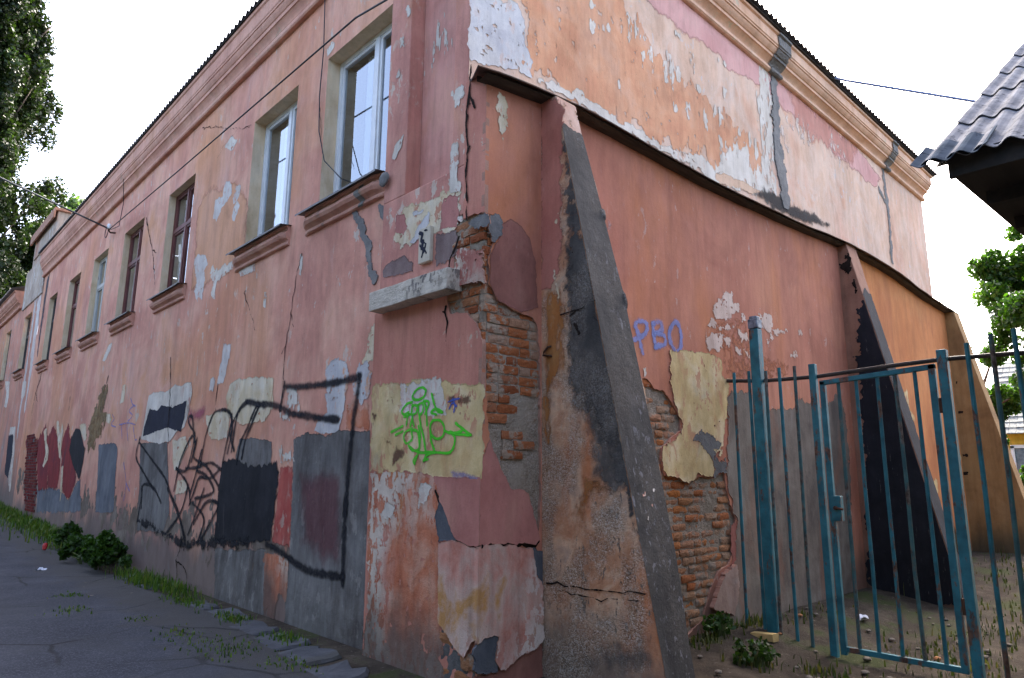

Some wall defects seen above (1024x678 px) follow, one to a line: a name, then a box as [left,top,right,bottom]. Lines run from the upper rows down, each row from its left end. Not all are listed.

peeling [392,134,404,160]
crack [448,64,475,267]
peeling [467,0,881,204]
peeling [191,181,255,300]
peeling [758,312,803,344]
peeling [314,142,545,678]
peeling [642,289,751,632]
crack [439,540,540,548]
crack [546,581,646,602]